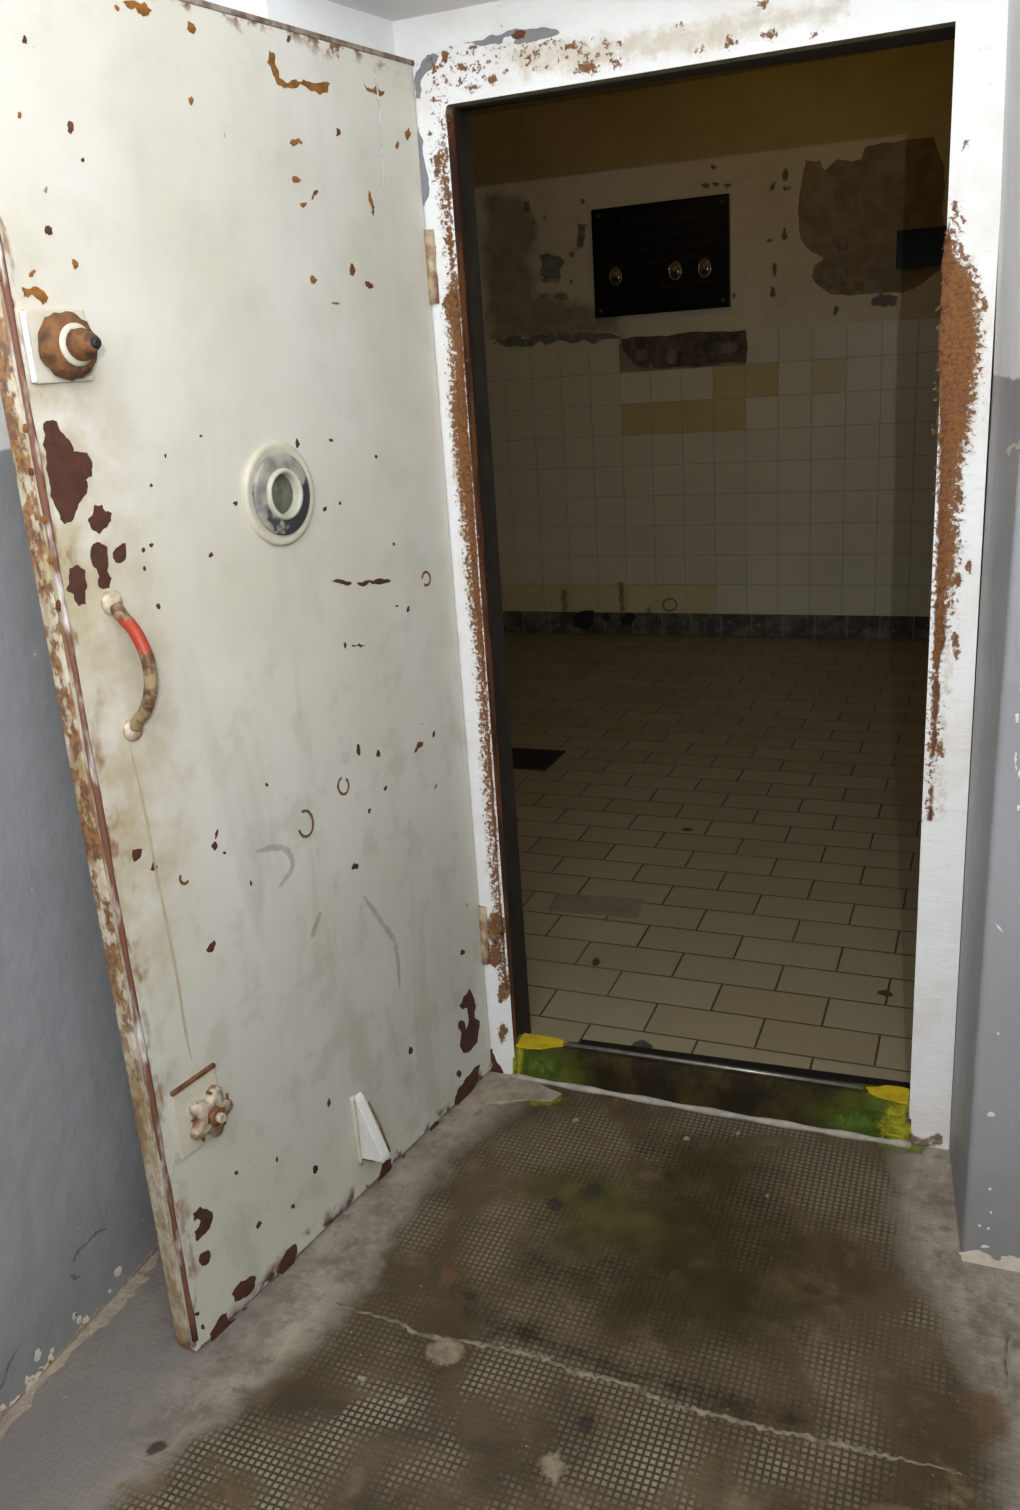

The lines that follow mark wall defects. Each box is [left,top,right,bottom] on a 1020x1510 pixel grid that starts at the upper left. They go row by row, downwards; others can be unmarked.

spalling [767,137,944,315]
peeling [621,330,748,368]
corrosion [22,420,153,612]
corrosion [395,38,623,1004]
corrosion [921,201,988,822]
corrosion [454,988,508,1105]
peeling [959,1211,1020,1273]
spalling [0,1242,160,1441]
crack [336,1302,962,1475]